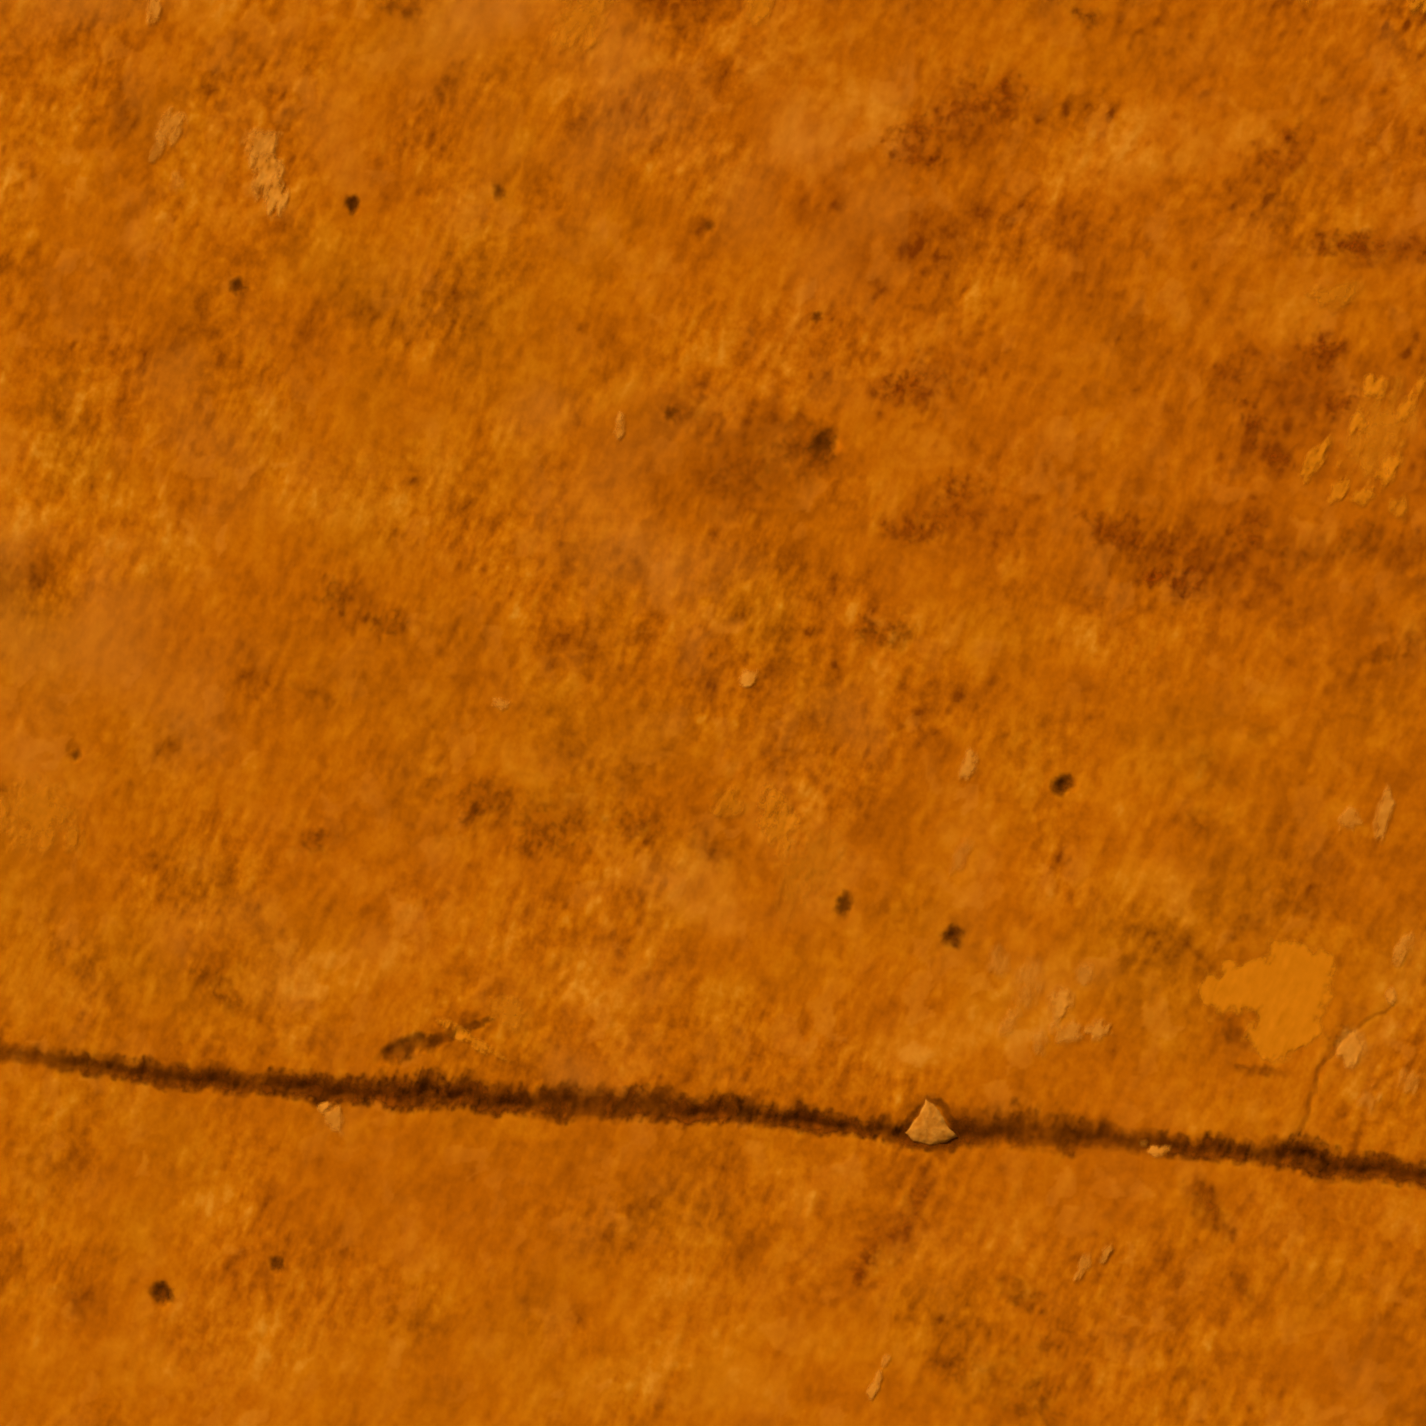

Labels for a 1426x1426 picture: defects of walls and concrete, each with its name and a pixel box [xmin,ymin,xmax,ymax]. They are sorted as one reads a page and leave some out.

crack [52,1017,1426,1189]
spalling [905,1099,957,1145]
peeling [1197,940,1336,1062]
peeling [1337,1031,1364,1067]